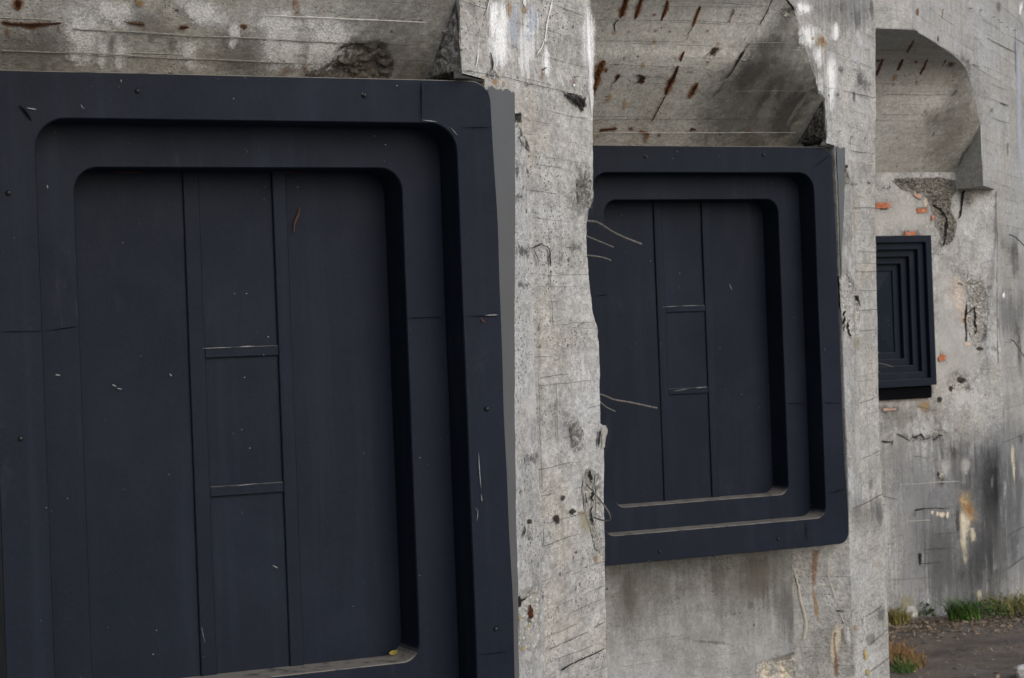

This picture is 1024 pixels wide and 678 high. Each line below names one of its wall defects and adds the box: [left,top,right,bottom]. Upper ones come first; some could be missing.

rust [2,0,61,35]
rust [613,0,643,34]
spalling [305,40,394,79]
rust [593,60,624,102]
spalling [797,102,826,147]
spalling [867,177,957,255]
crack [958,191,999,364]
spalling [951,271,990,351]
spalling [937,369,972,402]
spalling [553,468,603,553]
water stain [884,428,1024,605]